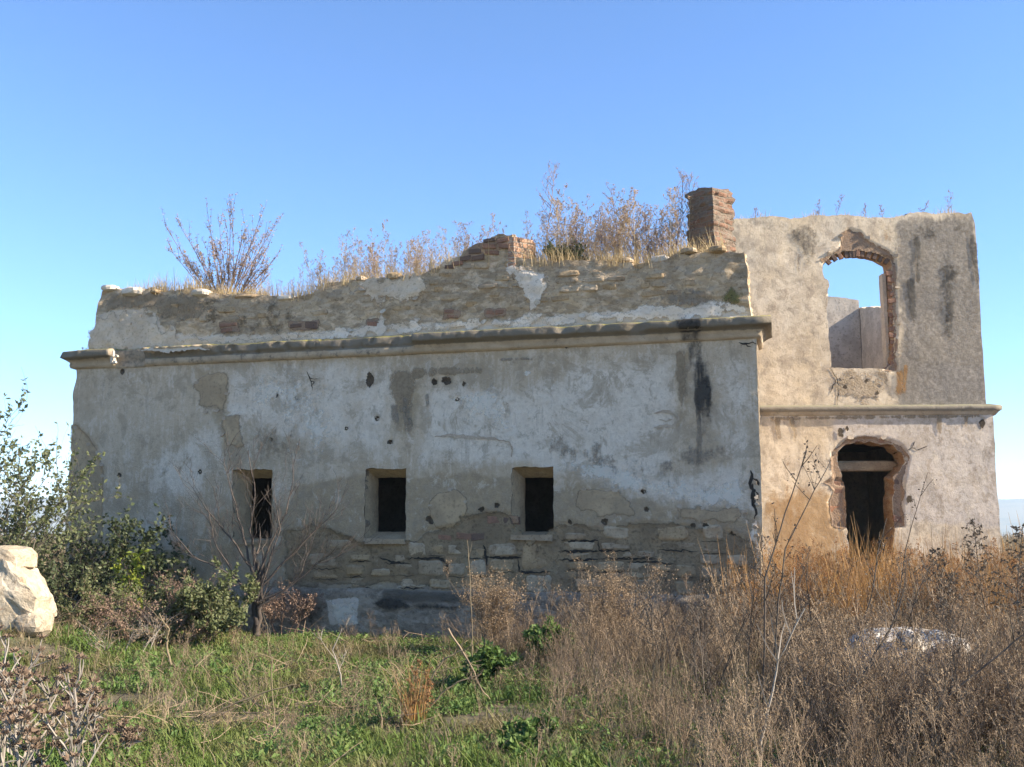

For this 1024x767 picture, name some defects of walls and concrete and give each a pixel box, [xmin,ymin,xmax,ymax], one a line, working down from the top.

flaking render [288,319,319,330]
flaking render [366,309,386,326]
flaking render [484,308,506,318]
flaking render [820,229,900,405]
damp [907,227,935,318]
damp [943,266,958,333]
damp [970,235,980,282]
damp [676,318,711,464]
flaking render [428,488,468,529]
crack [748,470,760,519]
flaking render [824,436,909,529]
flaking render [676,504,760,595]